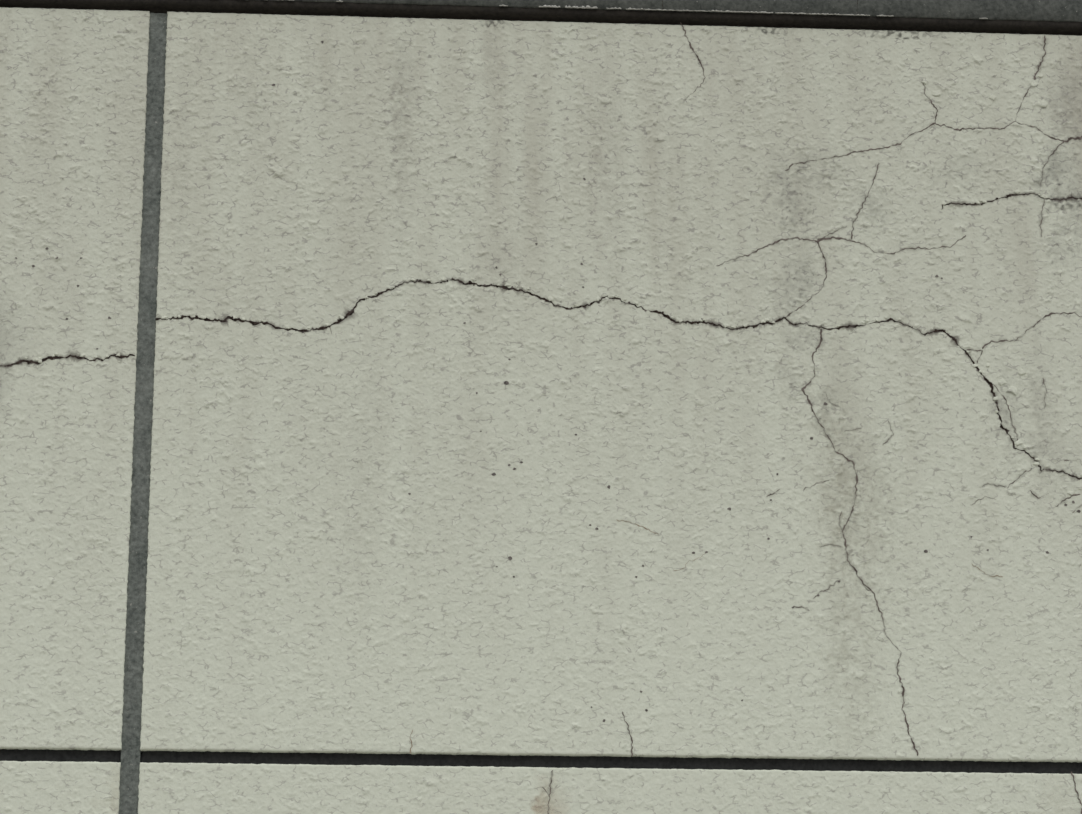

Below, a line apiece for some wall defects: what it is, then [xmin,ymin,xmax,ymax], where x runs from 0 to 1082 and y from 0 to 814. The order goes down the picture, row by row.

crack [662,1,706,101]
crack [0,353,135,367]
crack [155,35,1082,756]